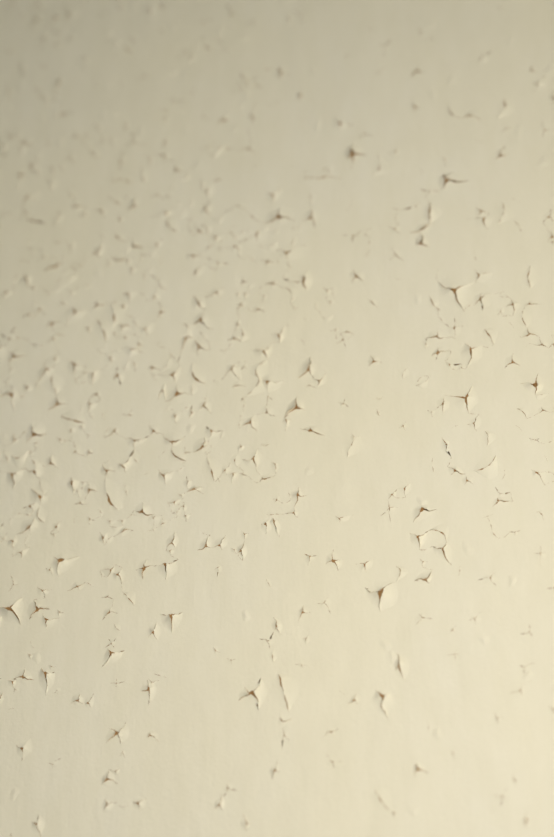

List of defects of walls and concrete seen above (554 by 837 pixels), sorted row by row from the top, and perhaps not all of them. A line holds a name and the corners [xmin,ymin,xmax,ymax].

peeling [437,172,468,191]
peeling [437,268,496,311]
peeling [520,374,544,395]
peeling [100,364,212,476]
peeling [437,386,482,430]
peeling [409,503,453,564]
peeling [51,549,81,576]
peeling [137,532,179,580]
peeling [0,586,59,629]
peeling [365,581,399,612]
peeling [13,668,55,695]
peeling [238,678,268,710]